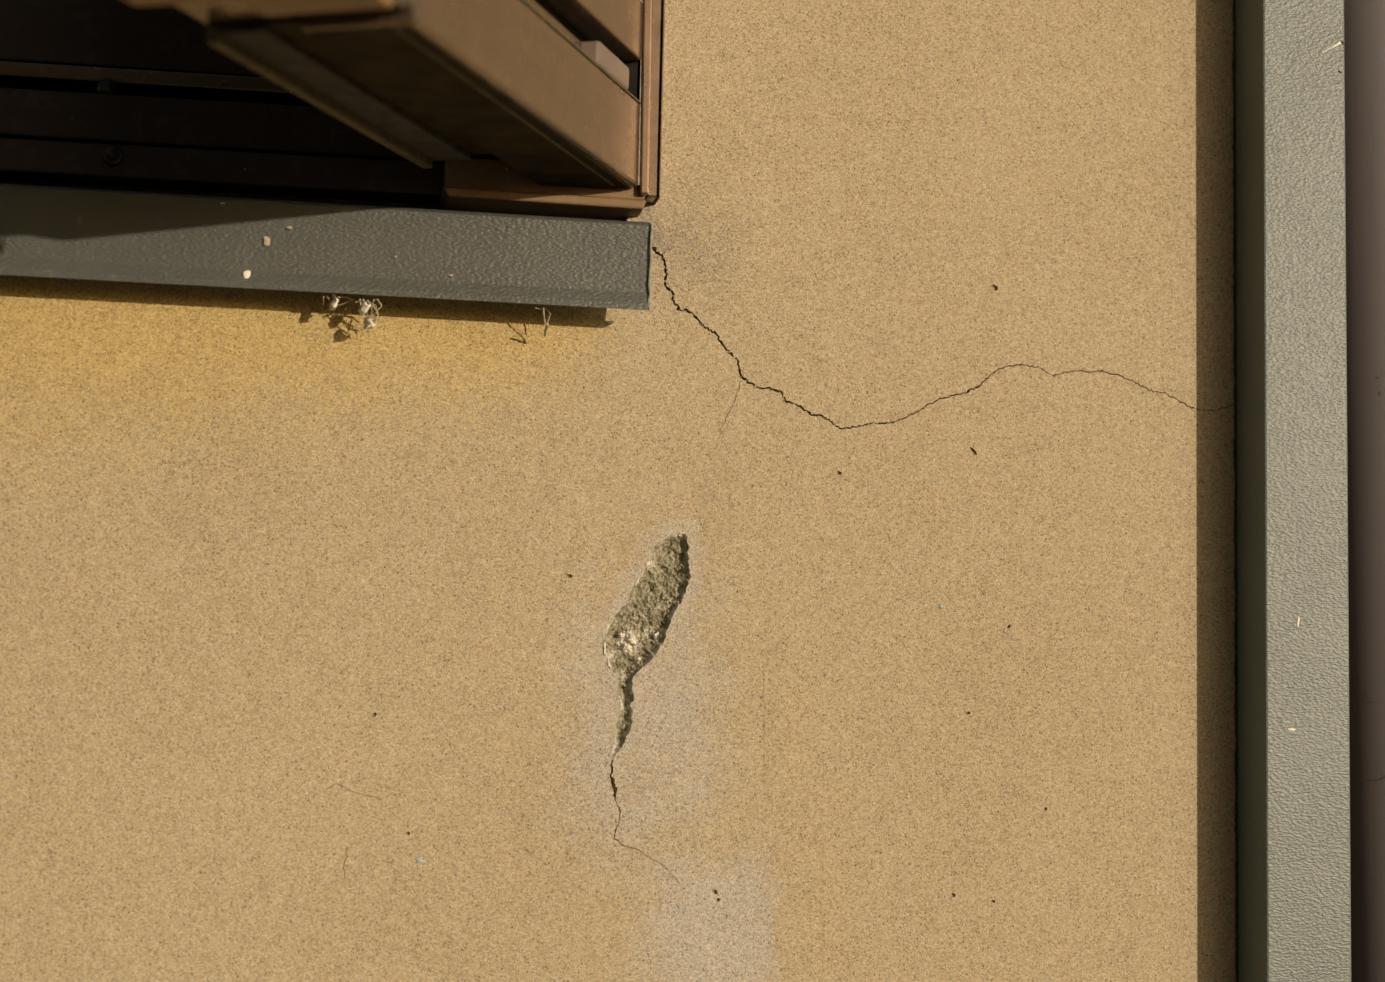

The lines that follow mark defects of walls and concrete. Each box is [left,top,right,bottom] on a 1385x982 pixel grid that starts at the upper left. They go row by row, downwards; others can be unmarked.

crack [652,244,1232,449]
spalling [601,523,697,770]
crack [609,760,676,879]